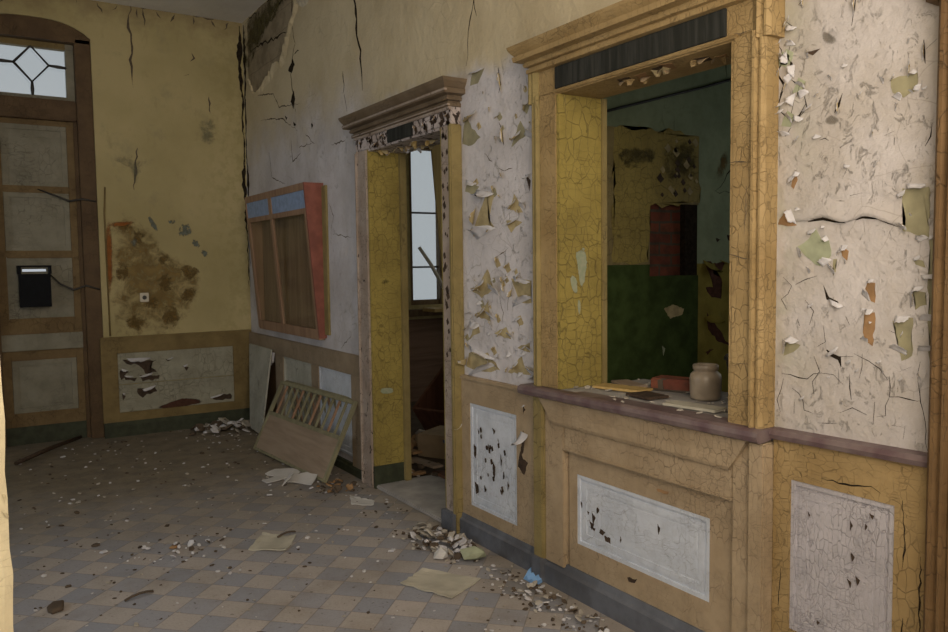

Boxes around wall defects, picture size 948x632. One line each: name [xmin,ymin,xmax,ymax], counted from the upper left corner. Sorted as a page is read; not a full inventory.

flaking render [243,0,298,99]
crack [343,0,362,109]
peeling [775,16,833,142]
crack [76,0,344,287]
peeling [465,172,525,240]
flaking render [611,125,701,265]
damp [116,225,199,329]
peeling [446,257,534,380]
crack [777,276,928,451]
peeling [860,279,876,346]
peeling [889,184,933,361]
peeling [474,427,528,495]